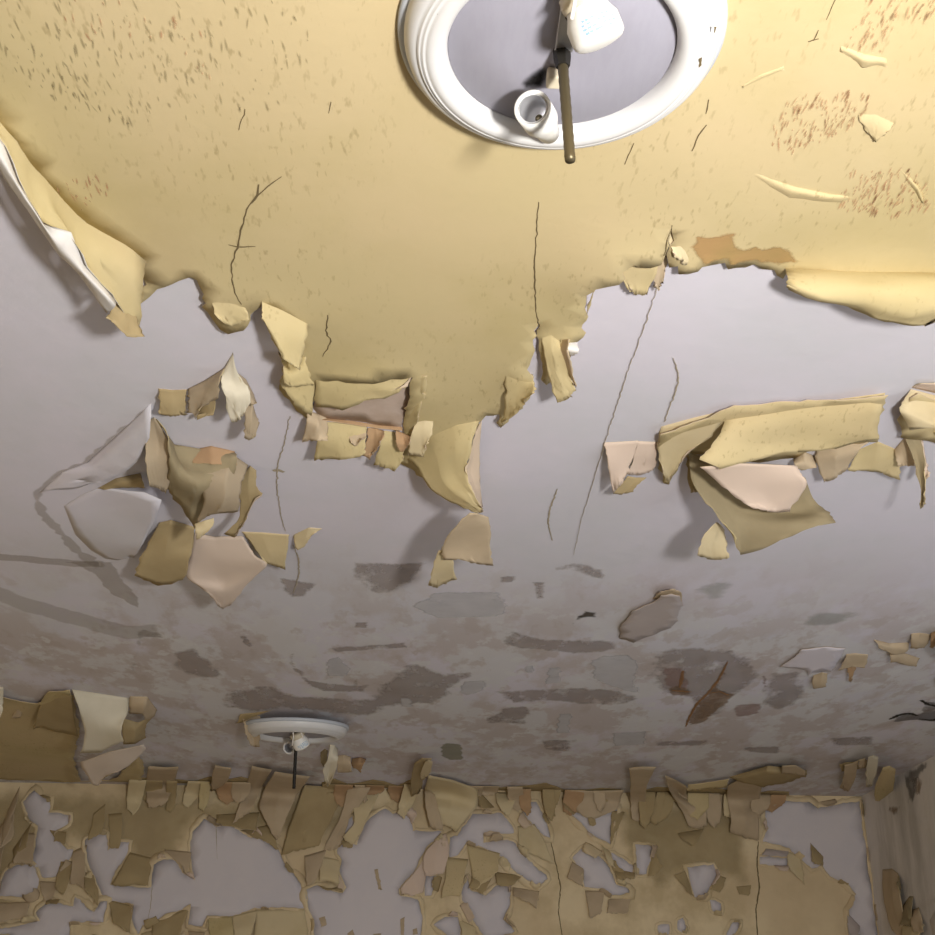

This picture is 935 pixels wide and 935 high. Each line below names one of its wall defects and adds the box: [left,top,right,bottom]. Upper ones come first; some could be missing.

crack [230,176,282,305]
peeling [0,0,935,609]
crack [532,202,540,329]
crack [574,288,657,550]
crack [272,416,300,594]
crack [547,489,558,541]
peeling [0,687,663,935]
leakage [441,743,463,760]
peeling [638,755,924,935]
flaking render [780,646,868,689]
peeling [874,631,935,667]
crack [889,700,935,721]